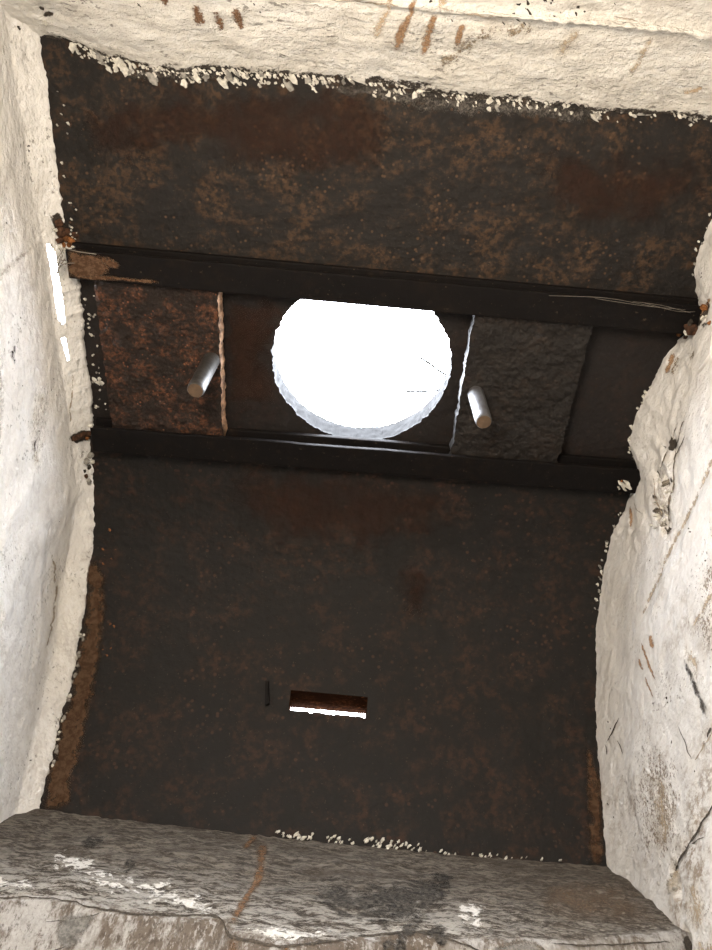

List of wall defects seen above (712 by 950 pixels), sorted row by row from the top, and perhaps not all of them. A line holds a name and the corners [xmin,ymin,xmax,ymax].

corrosion [192,5,244,31]
corrosion [395,0,417,50]
corrosion [422,0,446,54]
corrosion [455,25,465,46]
peeling [69,42,573,116]
corrosion [68,251,157,284]
corrosion [45,548,116,808]
crack [675,806,712,871]
corrosion [231,836,267,921]